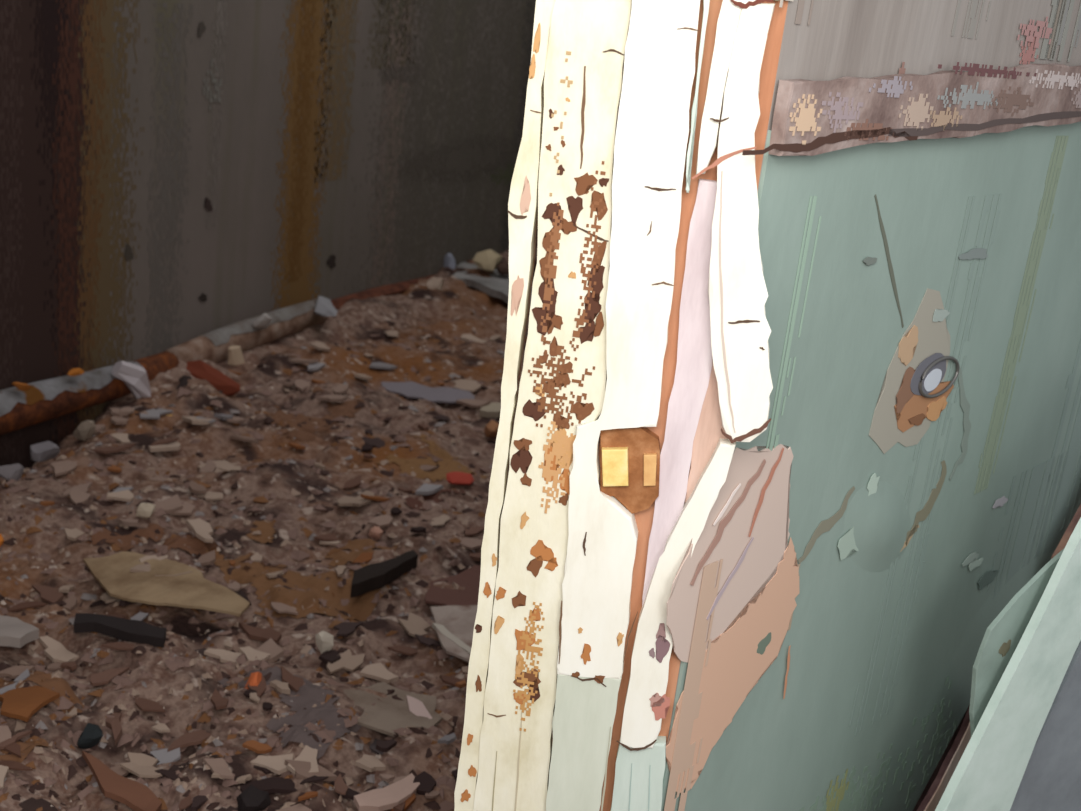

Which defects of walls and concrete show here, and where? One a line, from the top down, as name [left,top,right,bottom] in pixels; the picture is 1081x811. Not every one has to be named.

peeling [789,62,963,145]
peeling [1029,69,1081,108]
rust [510,76,609,514]
peeling [869,288,950,454]
rust [526,540,558,577]
peeling [649,366,799,811]